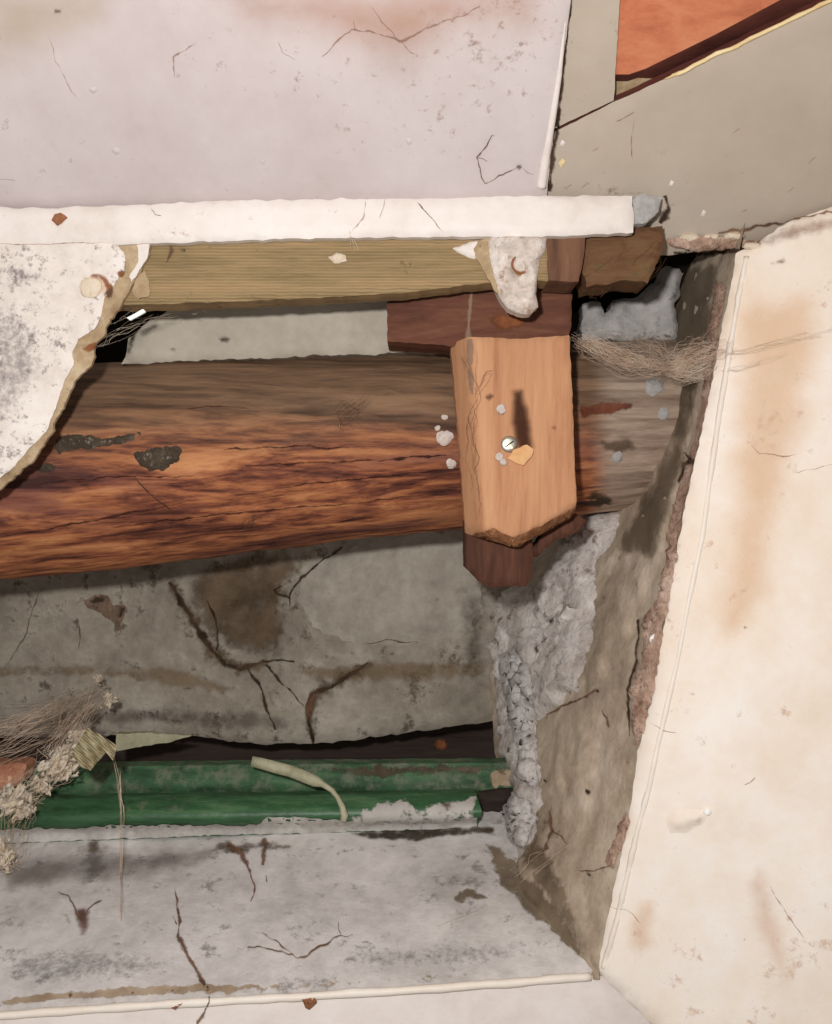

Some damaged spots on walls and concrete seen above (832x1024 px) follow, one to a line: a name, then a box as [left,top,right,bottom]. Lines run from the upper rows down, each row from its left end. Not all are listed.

crack [323,6,480,56]
crack [476,0,572,191]
spalling [626,278,727,748]
damp [194,555,294,652]
crack [273,547,343,607]
crack [168,581,410,744]
peeling [251,756,477,826]
corrosion [59,892,101,931]
crack [173,892,210,1024]
crack [247,922,353,958]